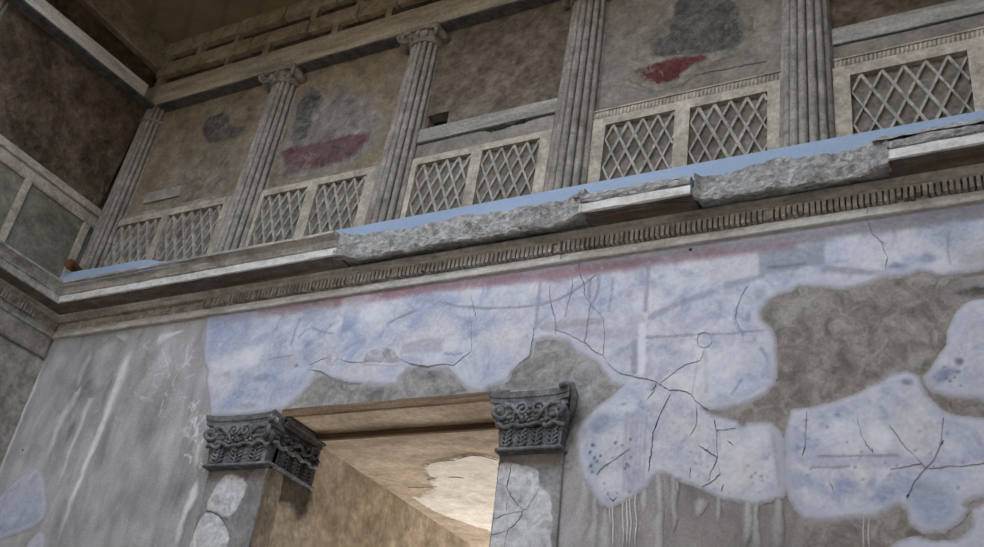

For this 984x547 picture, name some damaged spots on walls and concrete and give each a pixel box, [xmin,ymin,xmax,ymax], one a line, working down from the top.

crack [397,301,476,367]
crack [507,241,733,491]
flaking render [713,270,984,437]
water stain [0,320,210,547]
flaking render [269,339,618,483]
peeling [408,452,499,533]
crack [490,464,541,544]
water stain [569,473,679,547]
water stain [742,497,785,547]
crack [889,417,984,497]